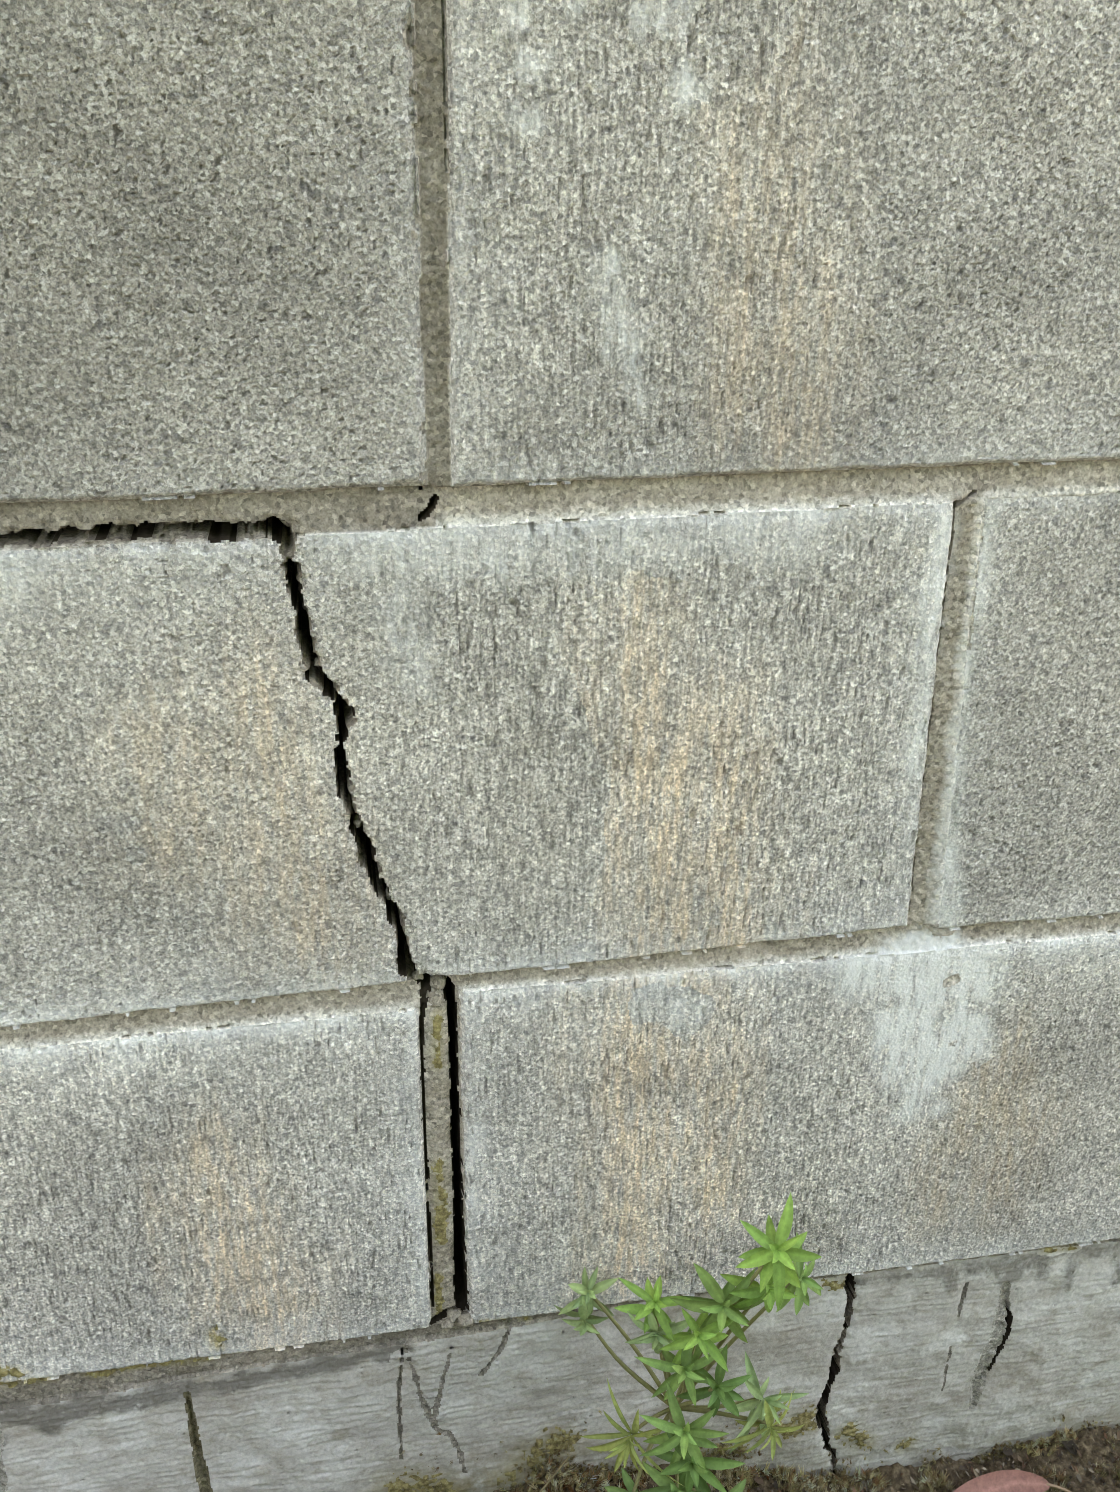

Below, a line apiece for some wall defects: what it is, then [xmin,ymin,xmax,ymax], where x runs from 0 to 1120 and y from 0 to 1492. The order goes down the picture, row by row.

crack [418,494,439,522]
crack [0,516,513,1473]
crack [814,1273,857,1473]
crack [0,1423,8,1492]
crack [183,1391,213,1492]